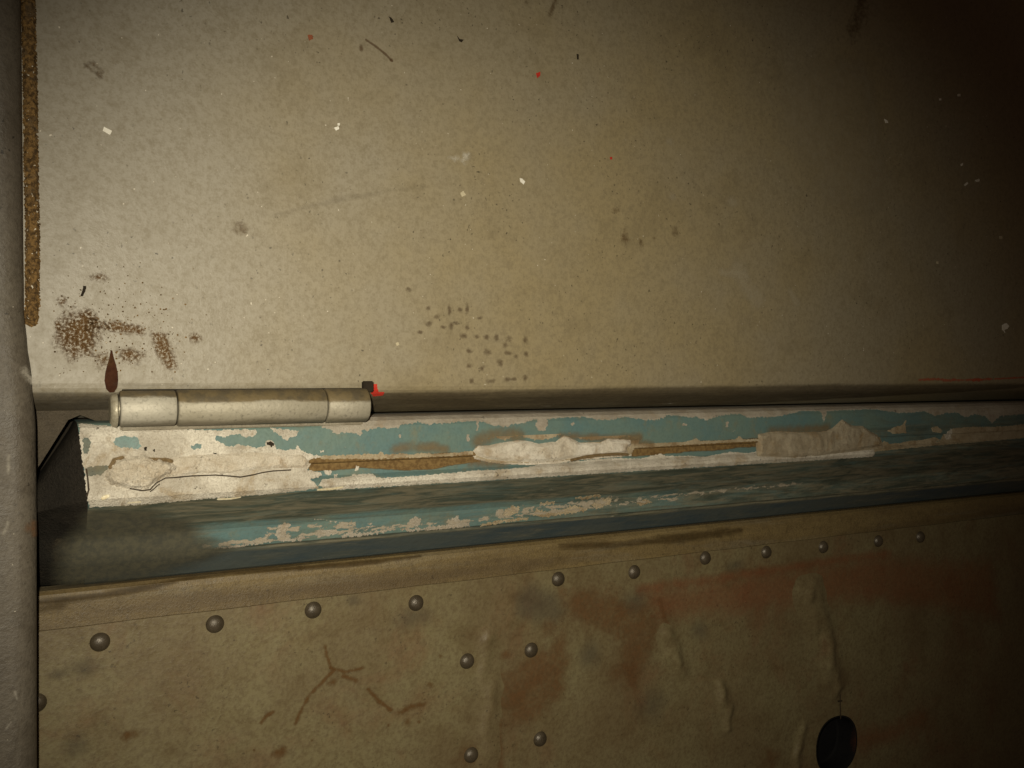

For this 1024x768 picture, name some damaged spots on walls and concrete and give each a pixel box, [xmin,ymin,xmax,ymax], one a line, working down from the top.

rust [21,0,199,374]
crack [85,456,124,497]
crack [130,458,291,492]
peeling [78,401,1024,508]
peeling [208,482,803,549]